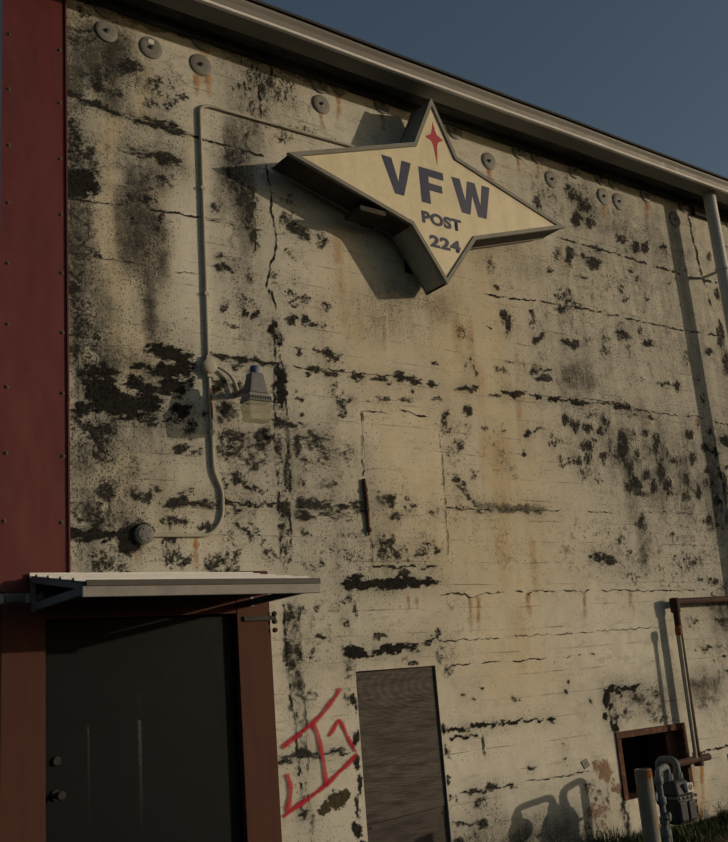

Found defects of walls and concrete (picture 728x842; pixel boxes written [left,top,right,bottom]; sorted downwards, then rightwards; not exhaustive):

water stain [67,3,192,178]
water stain [224,60,294,252]
crack [560,214,717,306]
crack [67,73,422,566]
crack [484,293,724,345]
mould [705,319,728,376]
crack [501,390,728,427]
water stain [70,352,365,573]
rust [362,478,372,536]
water stain [559,401,728,569]
crack [441,588,724,599]
spalling [585,759,622,828]